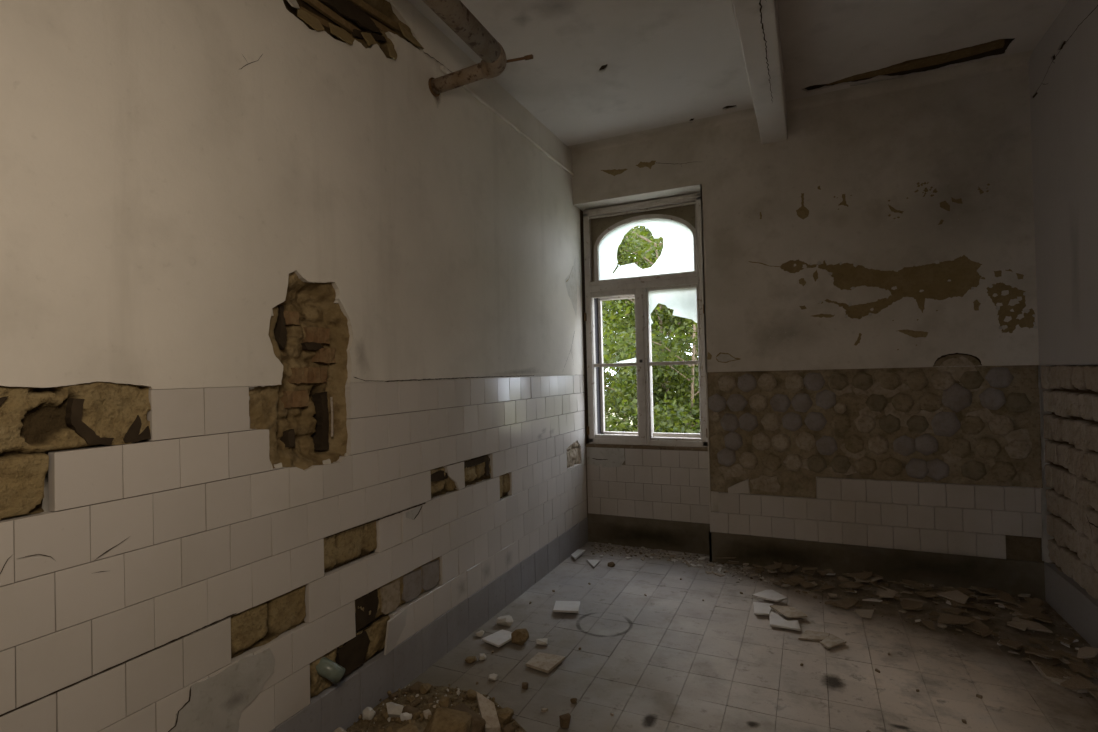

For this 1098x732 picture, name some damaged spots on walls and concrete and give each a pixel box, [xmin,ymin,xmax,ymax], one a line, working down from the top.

spalling [283,0,424,60]
crack [759,0,773,100]
peeling [748,255,1037,346]
spalling [245,272,350,470]
peeling [0,381,151,520]
peeling [431,454,510,498]
spalling [566,441,581,468]
peeling [707,352,1098,600]
peeling [324,520,377,573]
peeling [231,585,306,659]
peeling [310,557,440,699]
crack [168,687,191,732]